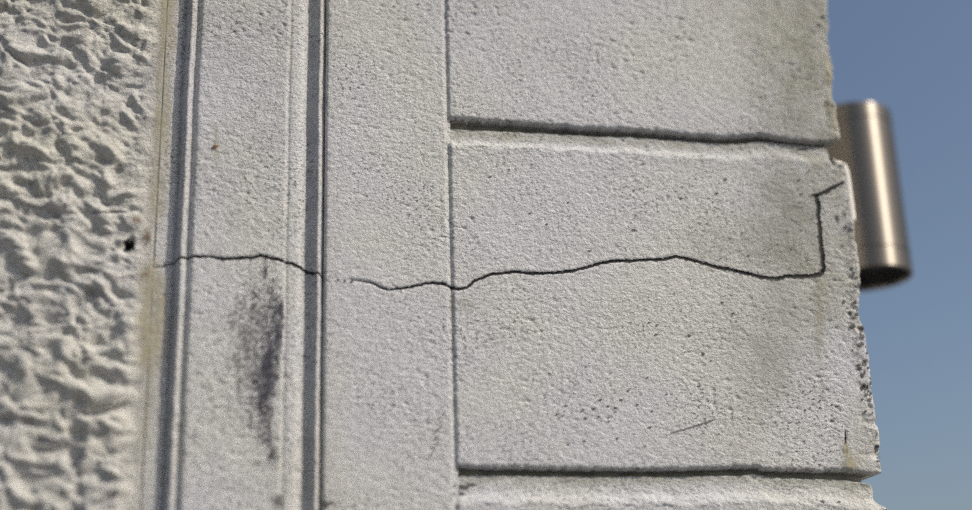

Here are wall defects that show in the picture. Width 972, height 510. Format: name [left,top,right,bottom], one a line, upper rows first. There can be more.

crack [157,155,845,291]
leakage [228,258,284,465]